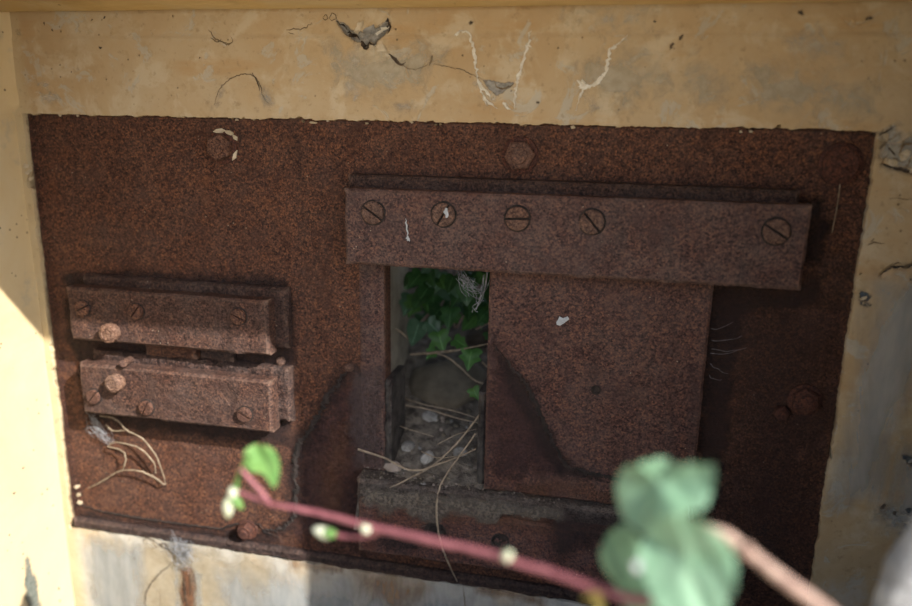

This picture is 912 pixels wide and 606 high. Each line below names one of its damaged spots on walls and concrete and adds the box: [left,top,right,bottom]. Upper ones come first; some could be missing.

crack [215,73,271,105]
peeling [332,18,424,97]
crack [389,54,481,79]
spalling [484,80,514,95]
spalling [877,126,912,169]
crack [883,163,912,174]
crack [880,262,912,275]
corrosion [52,298,146,385]
corrosion [697,274,821,506]
corrosion [69,368,383,551]
corrosion [736,324,808,569]
corrosion [180,568,195,606]